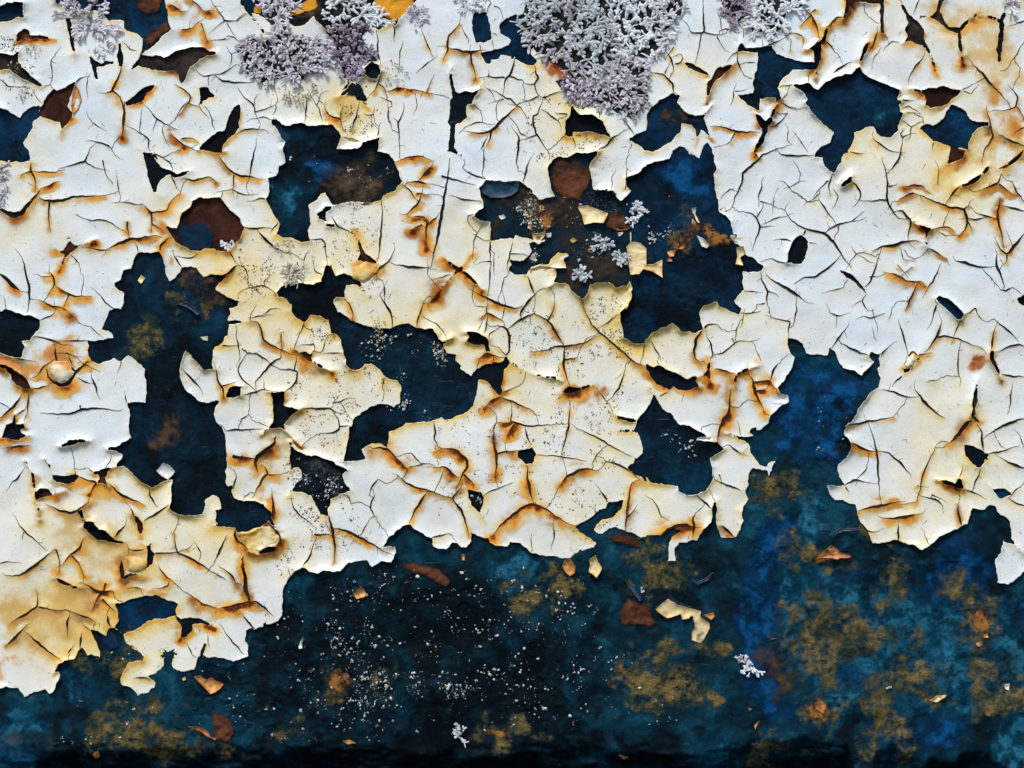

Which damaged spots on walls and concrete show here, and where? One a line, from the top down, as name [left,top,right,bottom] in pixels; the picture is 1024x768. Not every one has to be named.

corrosion [0,239,102,398]
peeling [88,251,274,532]
crack [0,0,739,682]
peeling [277,265,517,516]
corrosion [404,193,486,312]
corrosion [432,391,577,546]
peeling [0,338,1024,768]
peeling [475,93,764,344]
corrosion [642,356,780,443]
peeling [738,28,903,173]
crack [650,3,1024,544]
corrosion [927,4,1024,248]